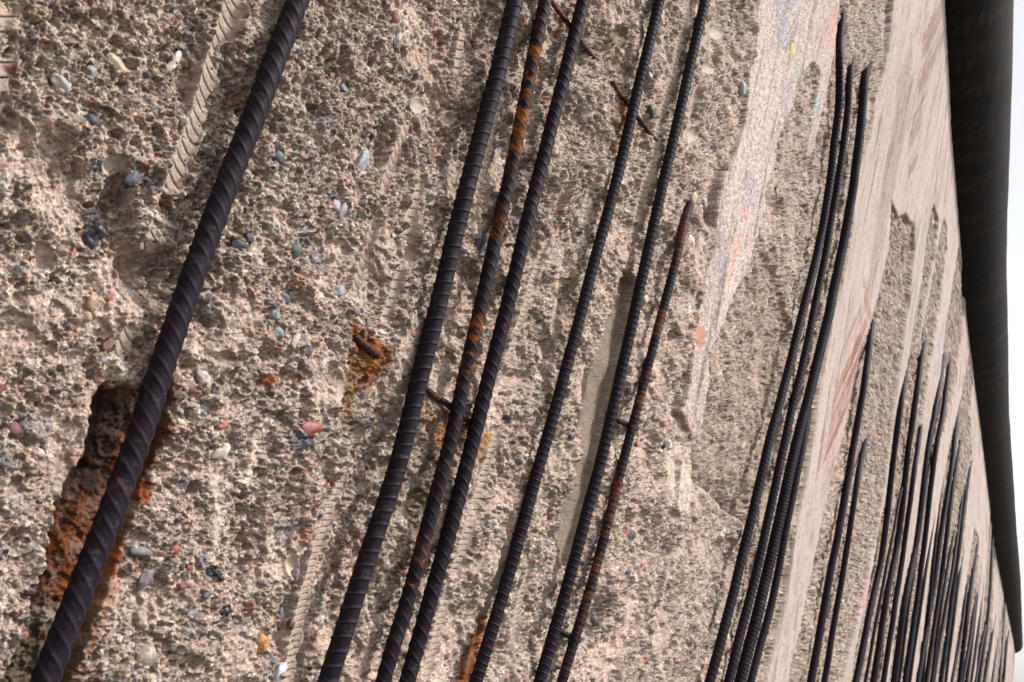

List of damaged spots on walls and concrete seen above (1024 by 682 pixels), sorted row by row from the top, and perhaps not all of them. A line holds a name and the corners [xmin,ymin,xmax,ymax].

corrosion [30,382,143,604]
corrosion [132,411,171,504]
spalling [0,0,552,682]
corrosion [345,324,392,410]
corrosion [425,406,448,450]
spalling [398,0,836,682]
spalling [704,0,891,682]
corrosion [456,616,487,682]